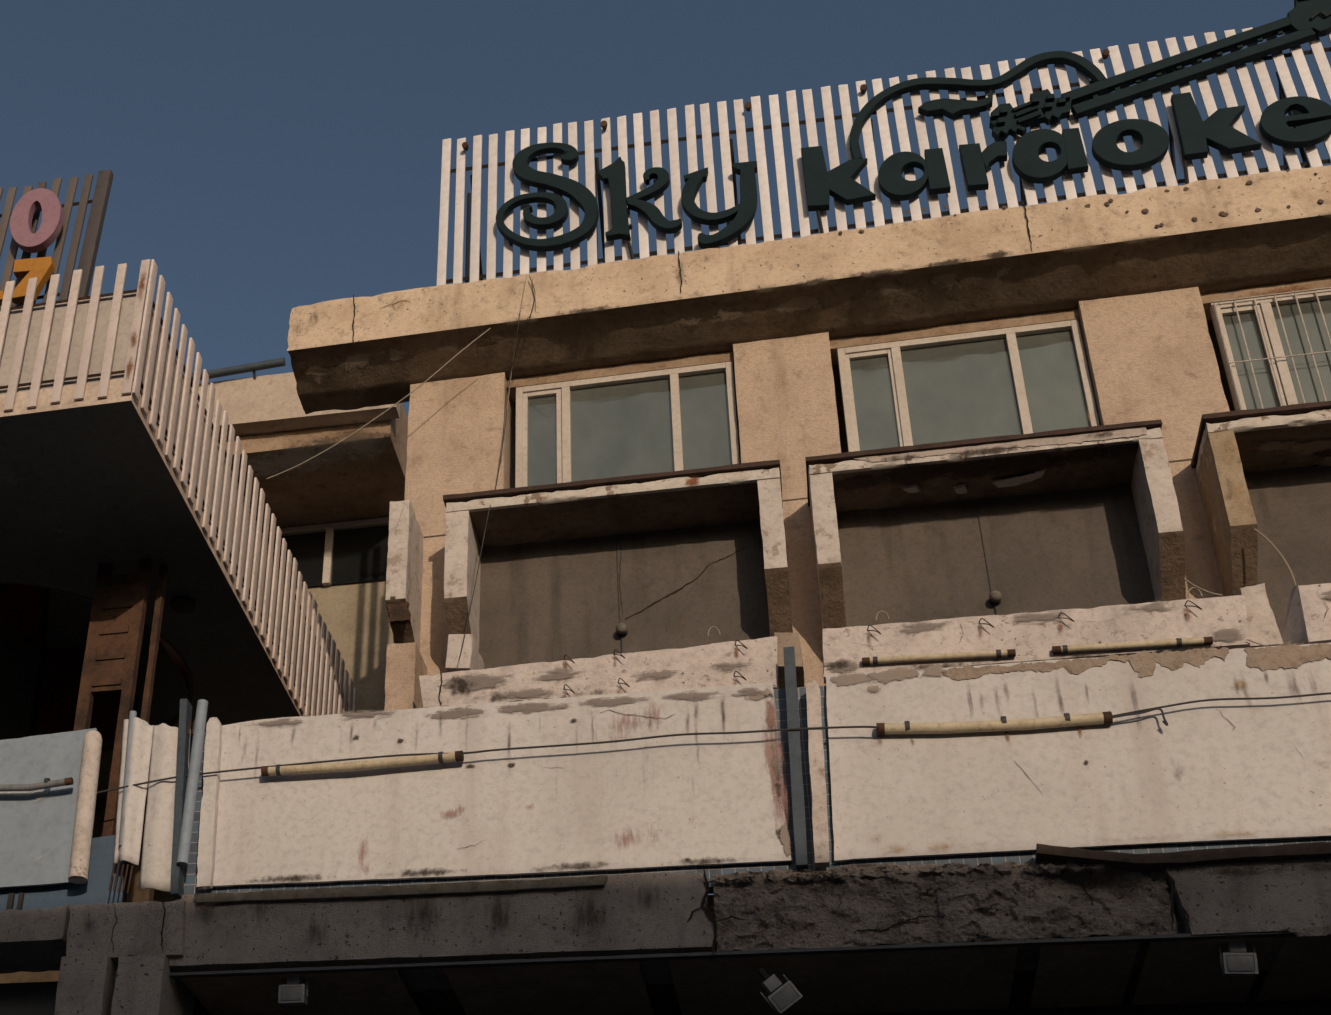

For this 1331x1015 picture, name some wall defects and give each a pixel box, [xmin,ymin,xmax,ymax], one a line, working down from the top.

spalling [834,427,1147,494]
crack [619,539,748,619]
peeling [824,629,1331,692]
crack [687,868,745,955]
spalling [713,821,1178,951]